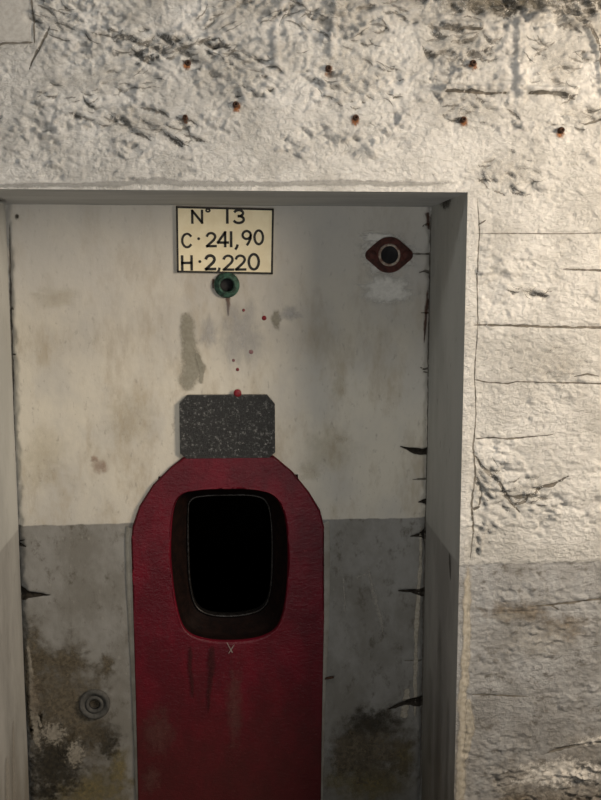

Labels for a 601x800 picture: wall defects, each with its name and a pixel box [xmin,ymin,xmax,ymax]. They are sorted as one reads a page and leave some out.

leakage [180,313,205,390]
crack [470,202,601,558]
leakage [23,627,118,799]